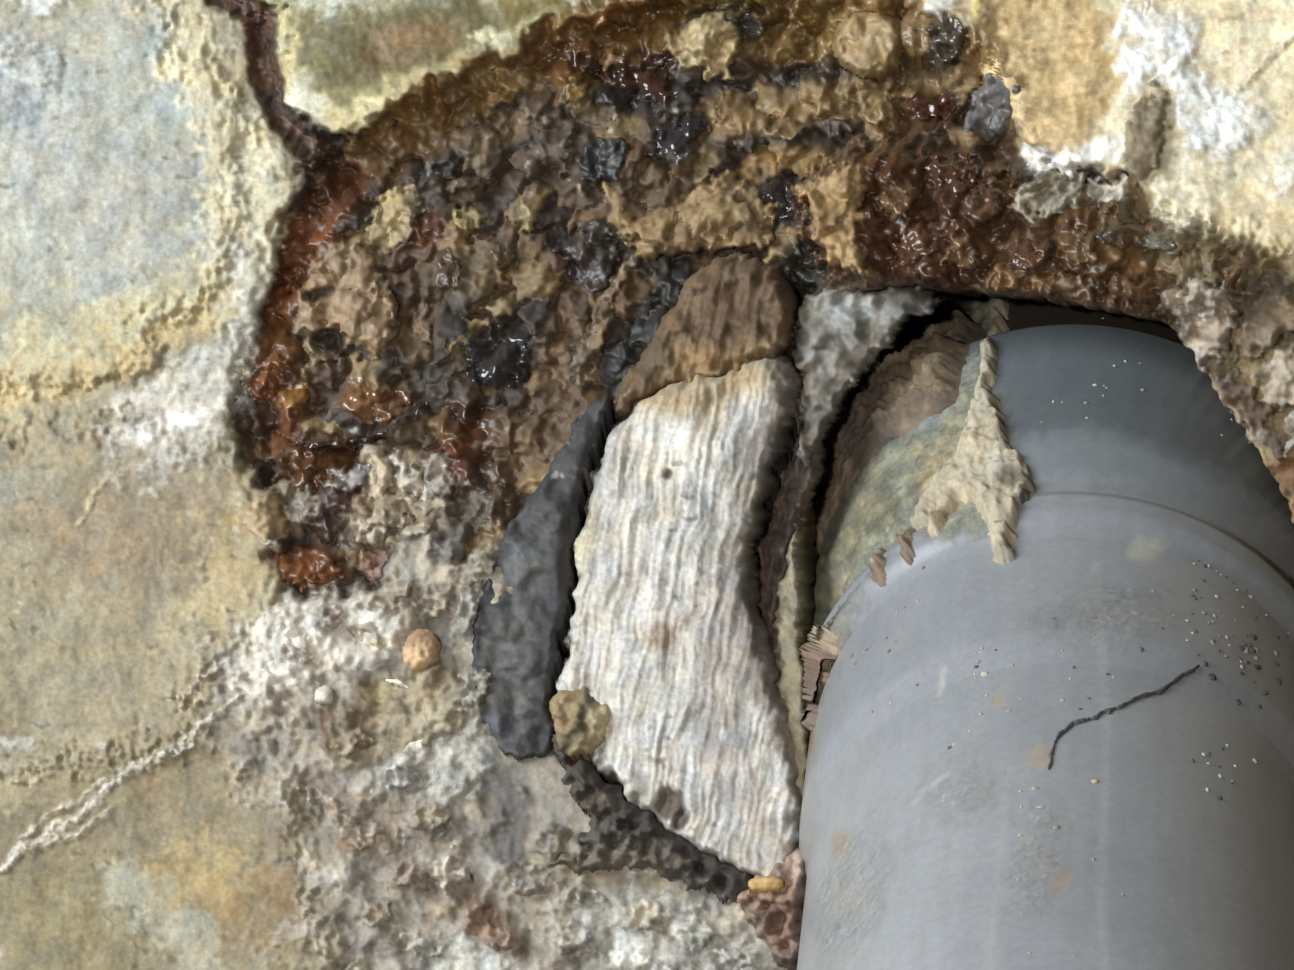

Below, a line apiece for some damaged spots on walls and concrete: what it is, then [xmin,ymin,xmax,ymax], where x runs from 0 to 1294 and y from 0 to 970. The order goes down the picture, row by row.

crack [206,0,398,213]
rust [243,0,696,493]
rust [1033,239,1135,300]
spalling [233,0,1294,928]
rust [1270,446,1294,521]
efflorescence [224,587,407,704]
crack [0,656,255,872]
damp [393,719,527,865]
damp [425,934,532,970]
spalling [512,824,606,957]
damp [573,876,782,970]
spalling [621,896,758,970]